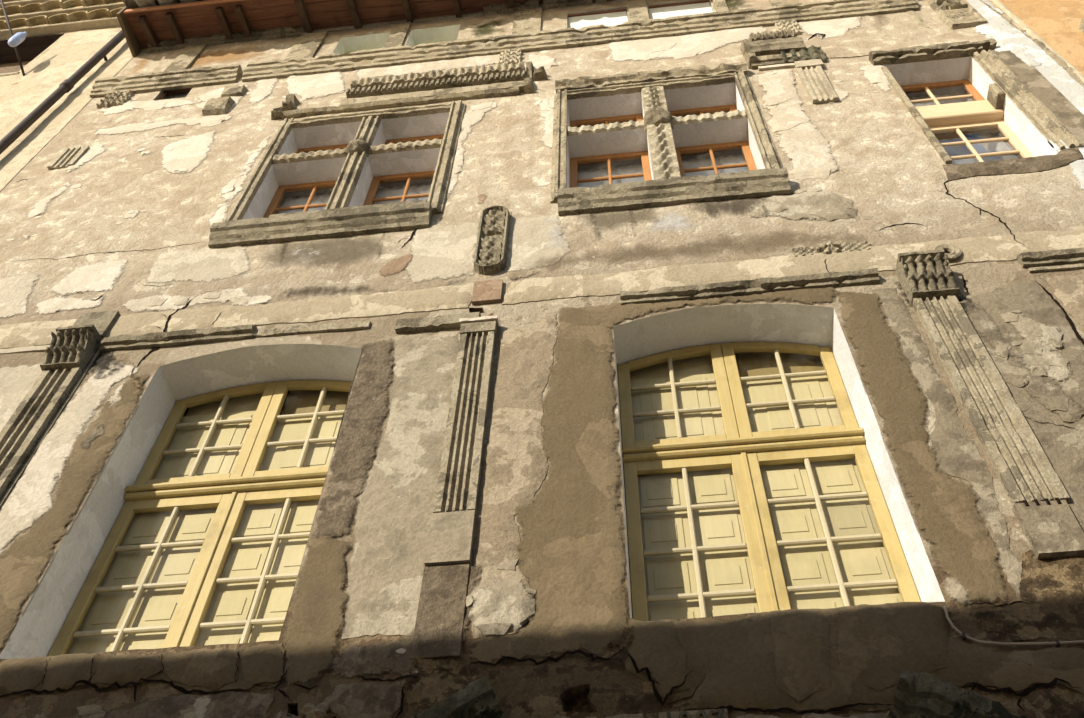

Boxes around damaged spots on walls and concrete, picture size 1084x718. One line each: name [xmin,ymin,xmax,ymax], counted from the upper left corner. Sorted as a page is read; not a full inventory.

peeling [609,26,769,62]
peeling [798,15,870,38]
peeling [28,54,500,226]
crack [936,180,1022,244]
crack [131,284,221,374]
spalling [122,287,273,312]
peeling [959,294,1084,423]
crack [1037,282,1084,345]
peeling [465,558,536,637]
crack [0,652,320,701]
crack [466,643,693,705]
crack [700,703,892,714]